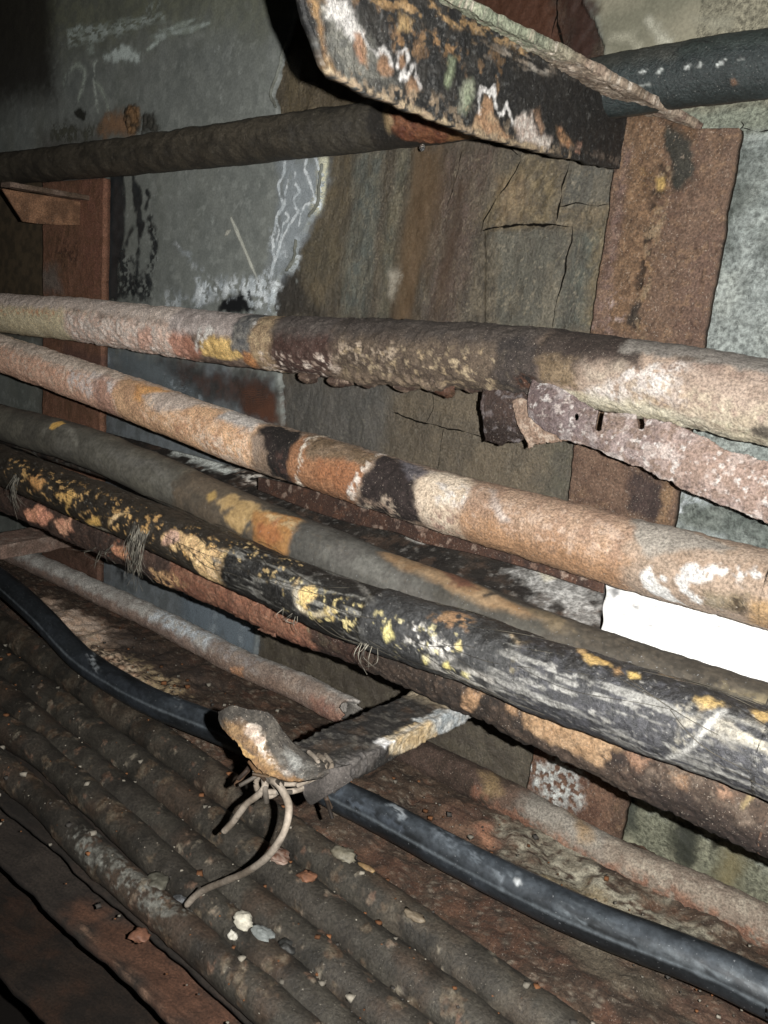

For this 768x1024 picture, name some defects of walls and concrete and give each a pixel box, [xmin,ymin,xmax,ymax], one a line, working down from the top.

leakage [166,157,328,313]
crack [482,146,606,327]
crack [394,394,483,466]